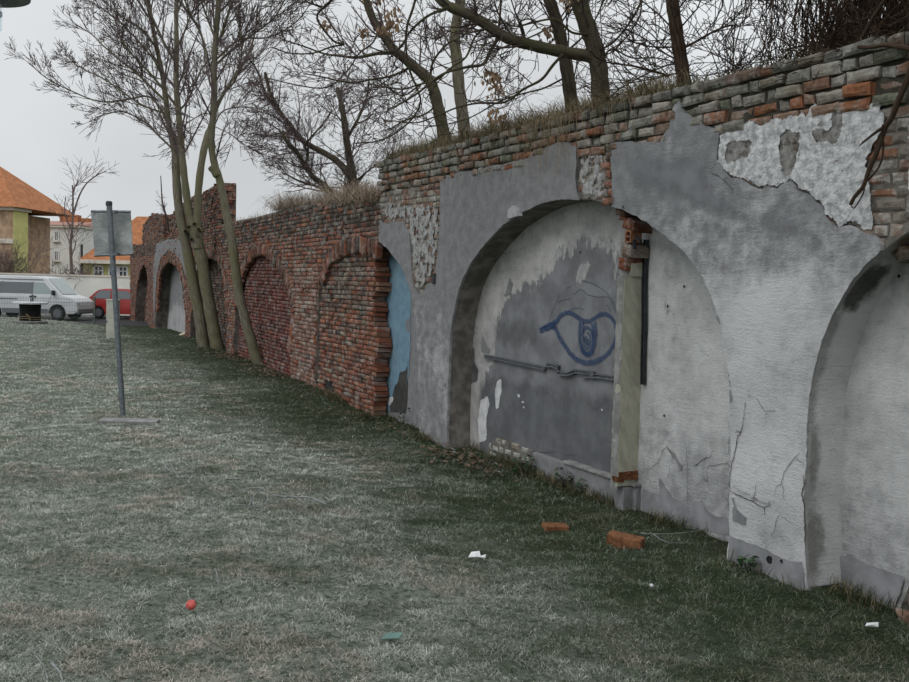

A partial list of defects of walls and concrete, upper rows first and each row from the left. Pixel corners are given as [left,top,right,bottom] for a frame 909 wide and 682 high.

flaking render [381,203,438,287]
flaking render [507,205,523,218]
flaking render [575,142,624,208]
flaking render [717,103,884,230]
flaking render [473,236,619,465]
crack [654,398,806,553]